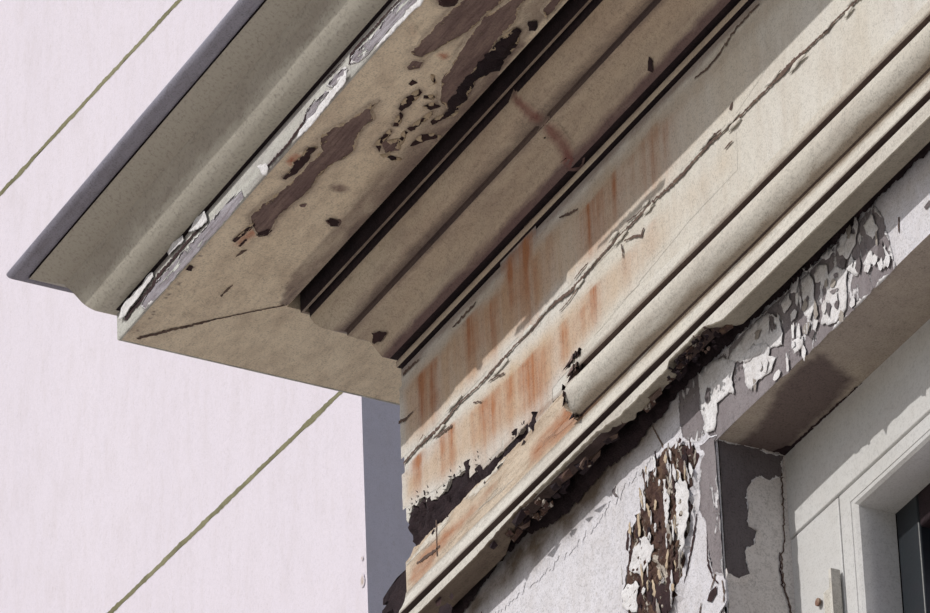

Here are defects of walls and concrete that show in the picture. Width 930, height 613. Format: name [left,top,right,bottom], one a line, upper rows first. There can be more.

peeling [297,0,424,138]
peeling [375,0,527,161]
peeling [695,4,759,78]
peeling [119,189,243,320]
peeling [248,100,380,236]
corrosion [399,26,774,510]
crack [403,0,858,463]
peeling [620,205,897,613]
damp [732,347,863,453]
crack [684,514,725,613]
crack [772,382,863,613]